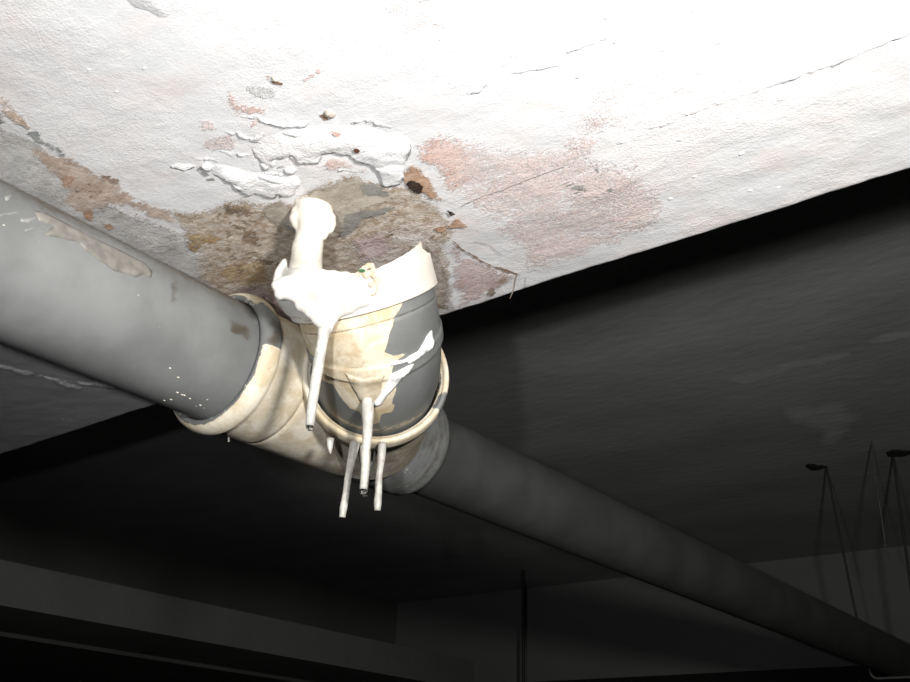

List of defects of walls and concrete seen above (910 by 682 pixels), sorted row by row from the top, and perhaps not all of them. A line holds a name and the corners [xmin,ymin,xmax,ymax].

leakage [228,85,276,126]
peeling [170,109,412,199]
leakage [0,114,519,431]